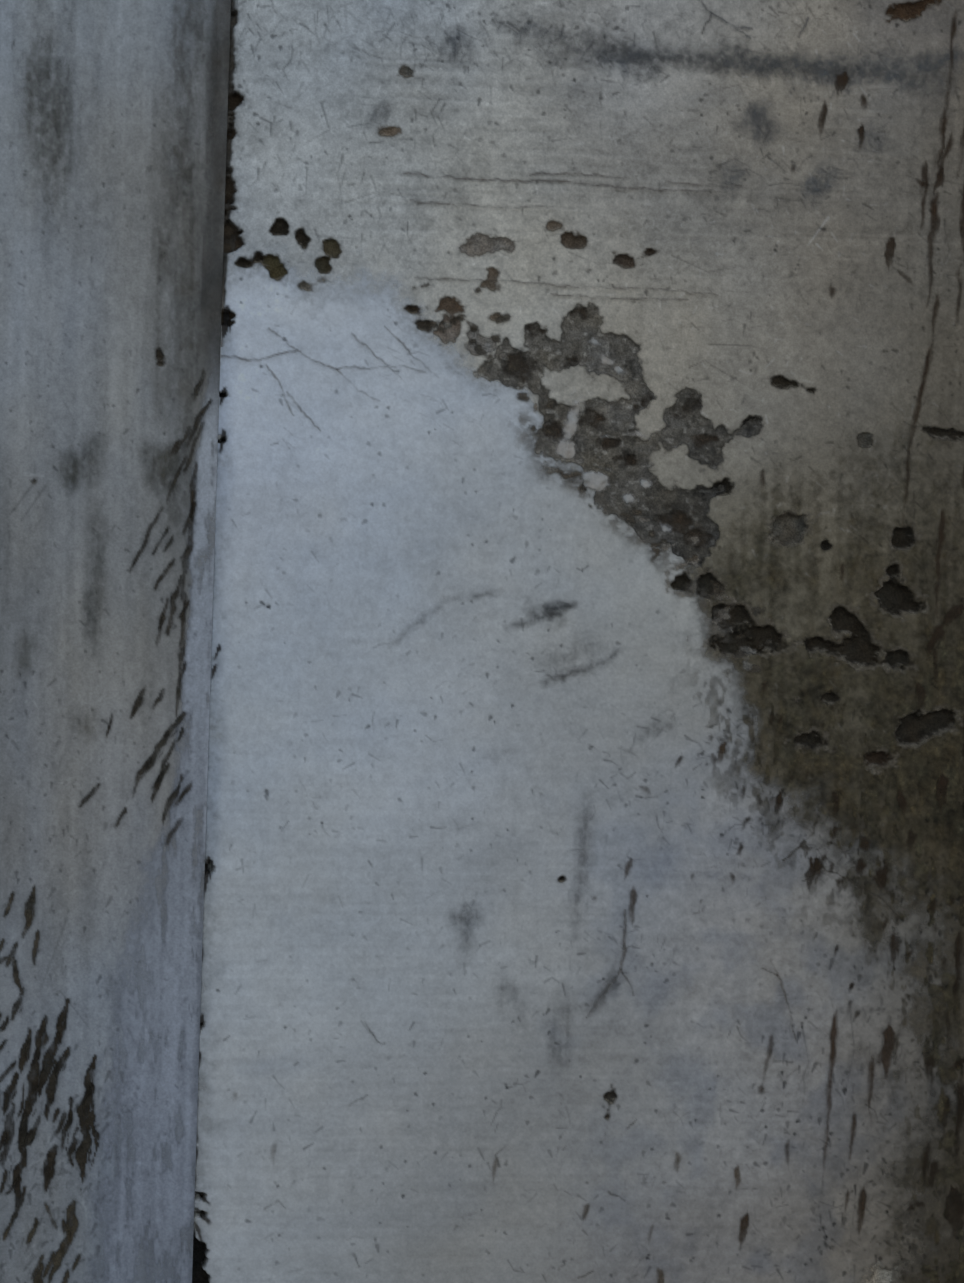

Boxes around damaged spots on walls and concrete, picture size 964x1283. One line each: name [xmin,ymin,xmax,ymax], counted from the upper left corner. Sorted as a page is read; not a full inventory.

spalling [459,233,515,293]
spalling [613,248,657,269]
corrosion [918,111,964,328]
corrosion [914,349,931,425]
spalling [404,297,914,674]
corrosion [761,792,783,812]
corrosion [805,856,833,885]
leakage [743,544,964,926]
corrosion [856,836,888,887]
peeling [0,886,40,1050]
peeling [0,998,99,1283]
leakage [913,942,964,1283]